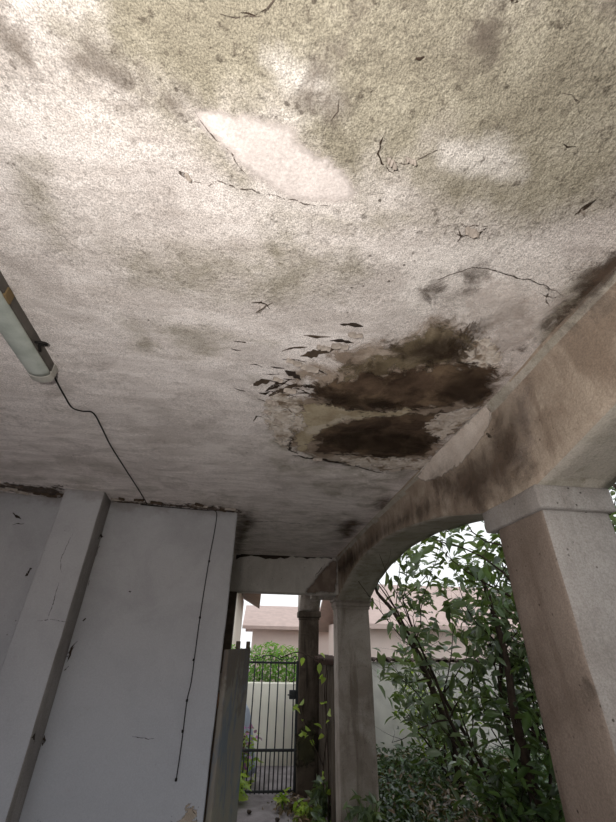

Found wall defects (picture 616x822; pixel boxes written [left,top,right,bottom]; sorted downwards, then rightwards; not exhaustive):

crack [219,0,275,19]
leakage [557,256,616,319]
spalling [235,314,509,481]